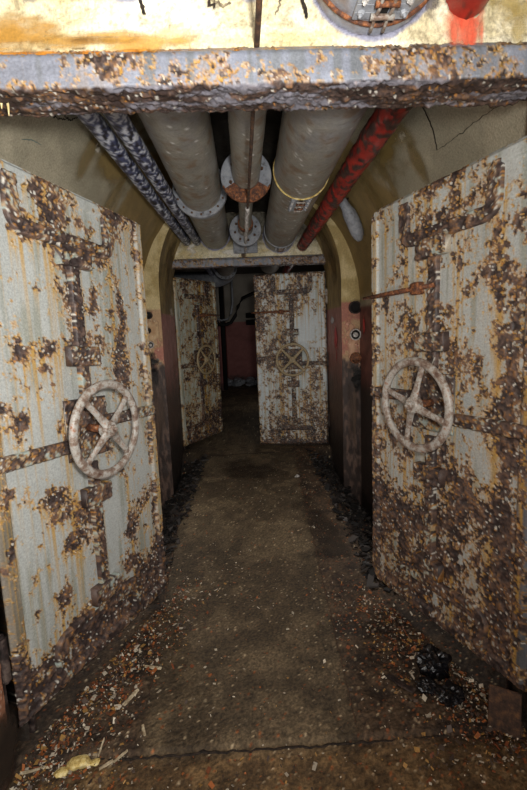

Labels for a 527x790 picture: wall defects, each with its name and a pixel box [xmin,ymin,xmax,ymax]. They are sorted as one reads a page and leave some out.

rust [223,182,270,203]
crack [100,466,449,761]